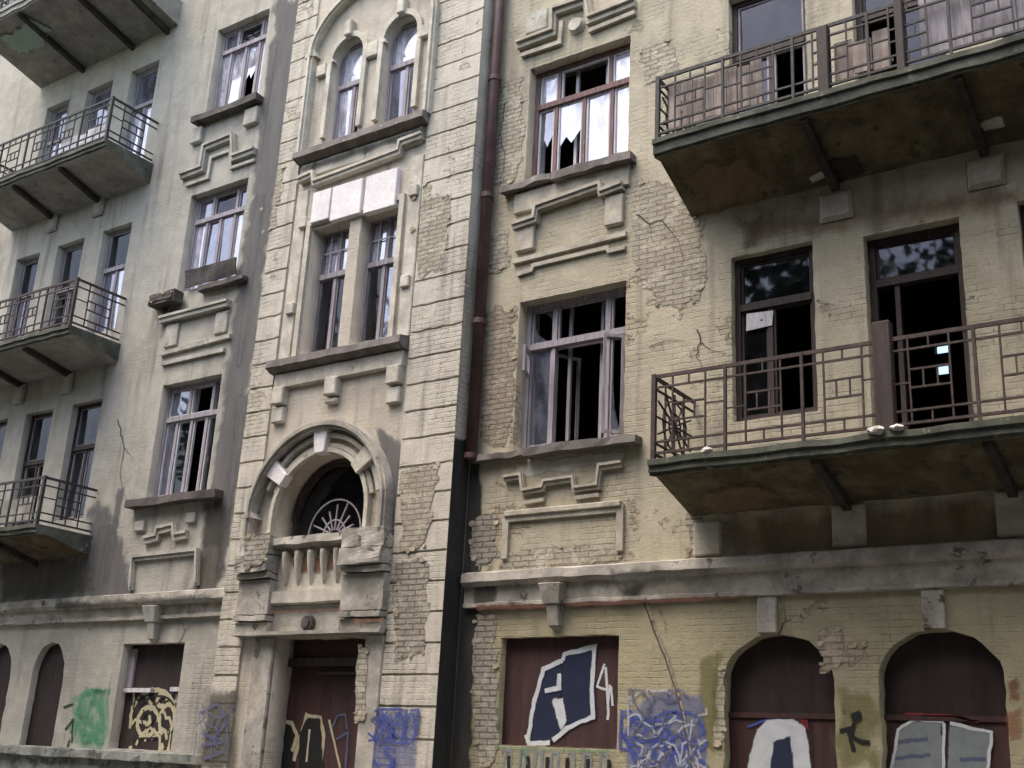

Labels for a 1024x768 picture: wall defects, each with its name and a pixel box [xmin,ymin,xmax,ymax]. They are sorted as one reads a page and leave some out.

peeling [494,76,526,185]
peeling [488,229,512,274]
crack [636,213,684,261]
peeling [631,178,708,320]
water stain [1,0,298,610]
crack [649,329,729,368]
crack [117,420,132,496]
spalling [468,514,624,571]
spalling [393,556,430,663]
spalling [353,644,369,723]
spalling [469,613,499,768]
spalling [817,626,868,674]